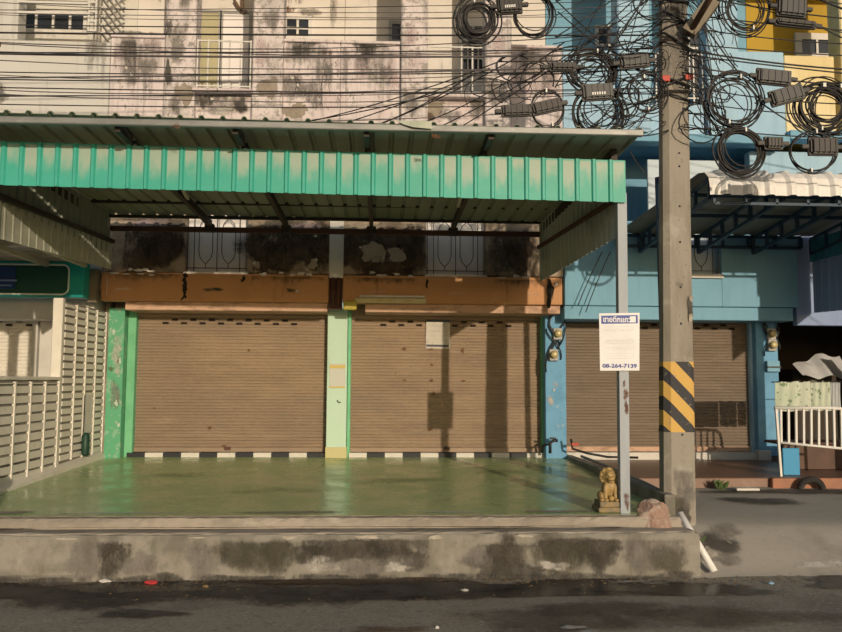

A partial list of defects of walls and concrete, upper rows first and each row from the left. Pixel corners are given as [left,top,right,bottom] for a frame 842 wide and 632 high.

damp [293,42,330,78]
damp [358,44,392,66]
damp [124,218,185,277]
damp [235,217,330,280]
spalling [359,241,407,262]
damp [343,225,426,282]
damp [492,231,534,284]
damp [188,539,427,581]
damp [431,527,692,579]